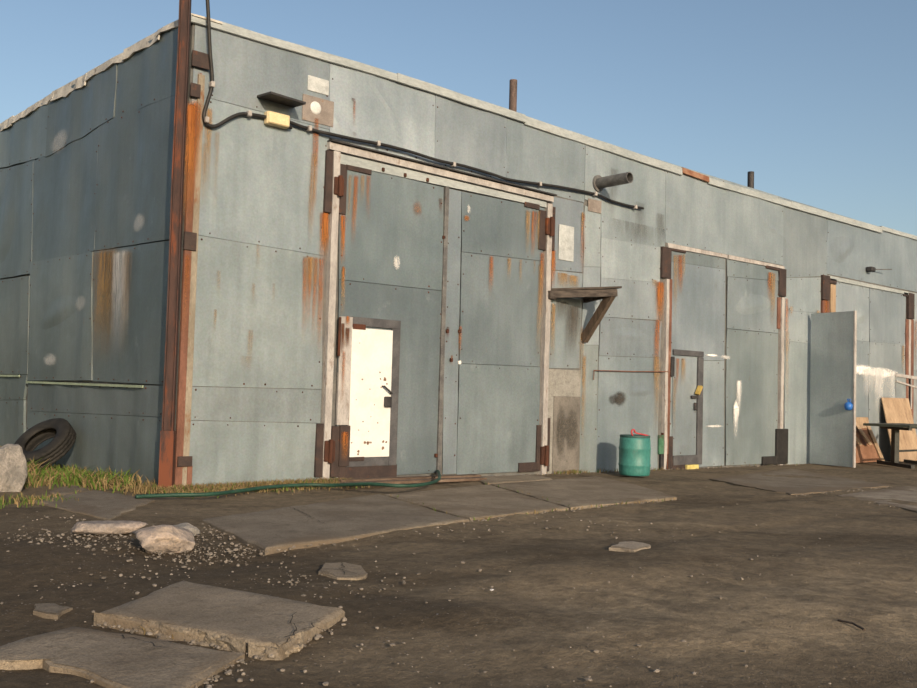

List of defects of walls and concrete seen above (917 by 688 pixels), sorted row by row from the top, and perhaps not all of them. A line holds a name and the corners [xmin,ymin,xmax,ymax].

corrosion [185,102,212,181]
corrosion [320,212,329,246]
corrosion [341,176,364,249]
corrosion [96,251,126,322]
corrosion [303,257,323,301]
corrosion [341,316,350,375]
corrosion [655,282,664,384]
damp [557,414,577,453]